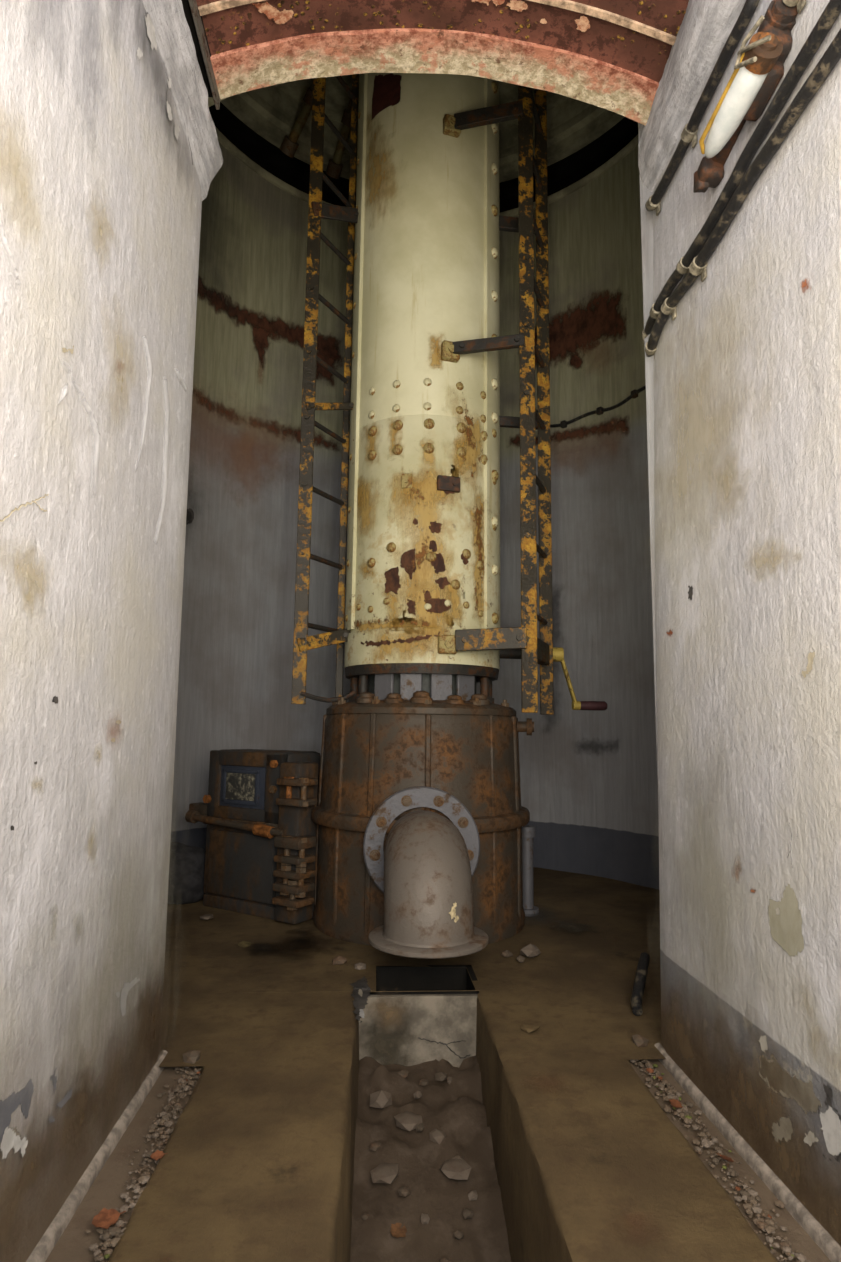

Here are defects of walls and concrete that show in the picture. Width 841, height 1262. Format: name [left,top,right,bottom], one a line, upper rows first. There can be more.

flaking render [136,14,157,60]
rust [252,2,294,24]
rust [472,0,528,12]
rust [575,16,590,32]
flaking render [167,77,180,140]
rust [197,276,342,386]
rust [535,290,627,369]
peeling [768,884,804,956]
peeling [0,1080,35,1159]
peeling [758,1035,841,1162]